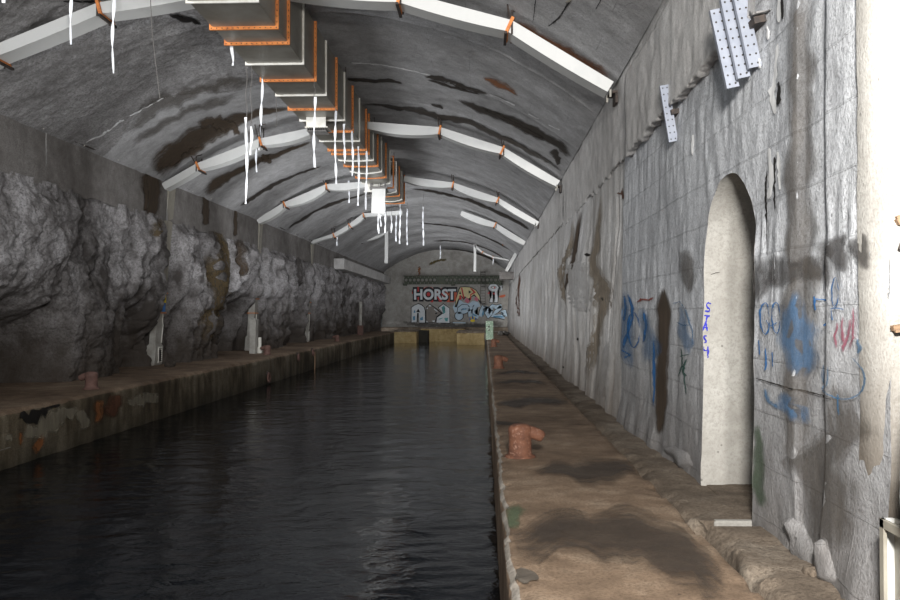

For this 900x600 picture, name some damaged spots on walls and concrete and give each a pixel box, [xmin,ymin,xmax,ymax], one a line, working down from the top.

crack [533,0,572,26]
water stain [134,77,288,220]
water stain [368,75,568,169]
rust [485,78,516,95]
water stain [656,290,671,433]